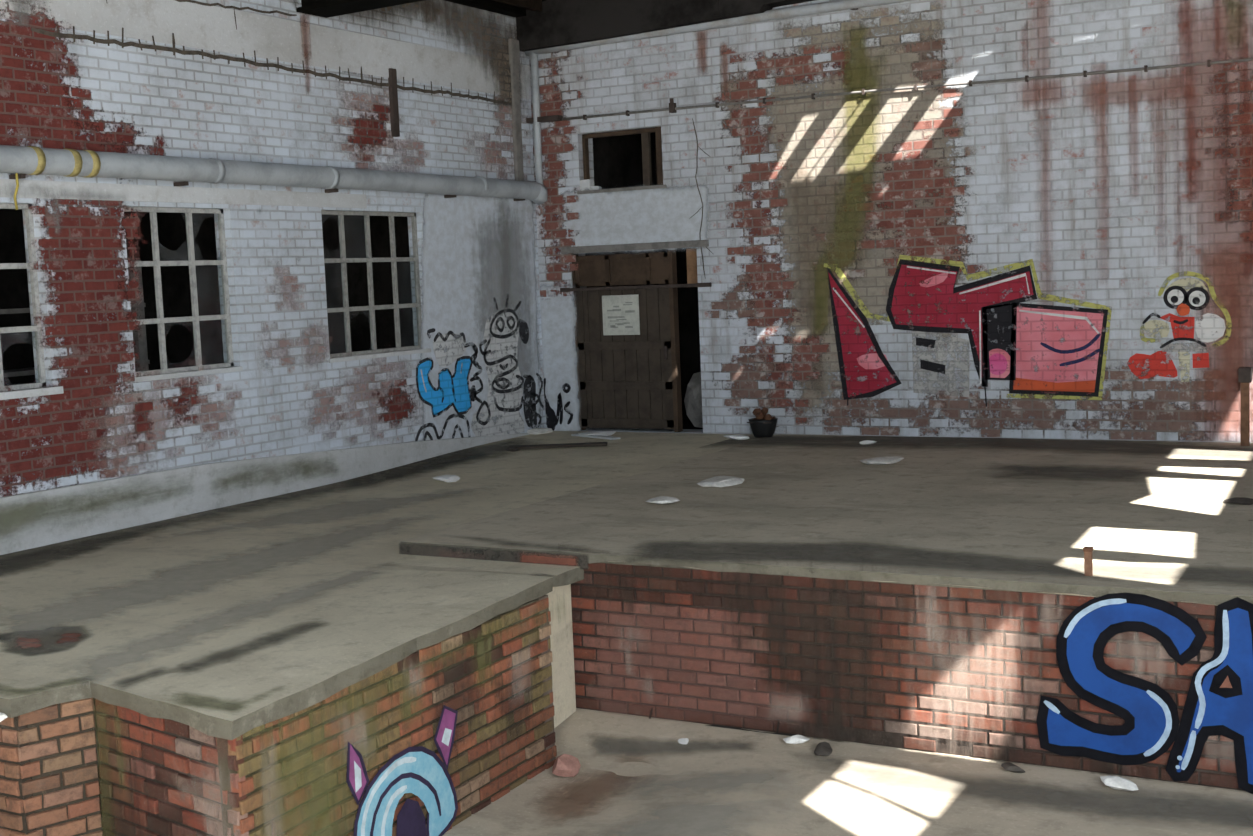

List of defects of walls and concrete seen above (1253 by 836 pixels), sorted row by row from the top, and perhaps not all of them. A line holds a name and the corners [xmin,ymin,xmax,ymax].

peeling [0,0,167,156]
peeling [335,89,424,169]
peeling [474,50,582,297]
damp [849,28,866,97]
peeling [708,2,1226,441]
peeling [0,198,241,497]